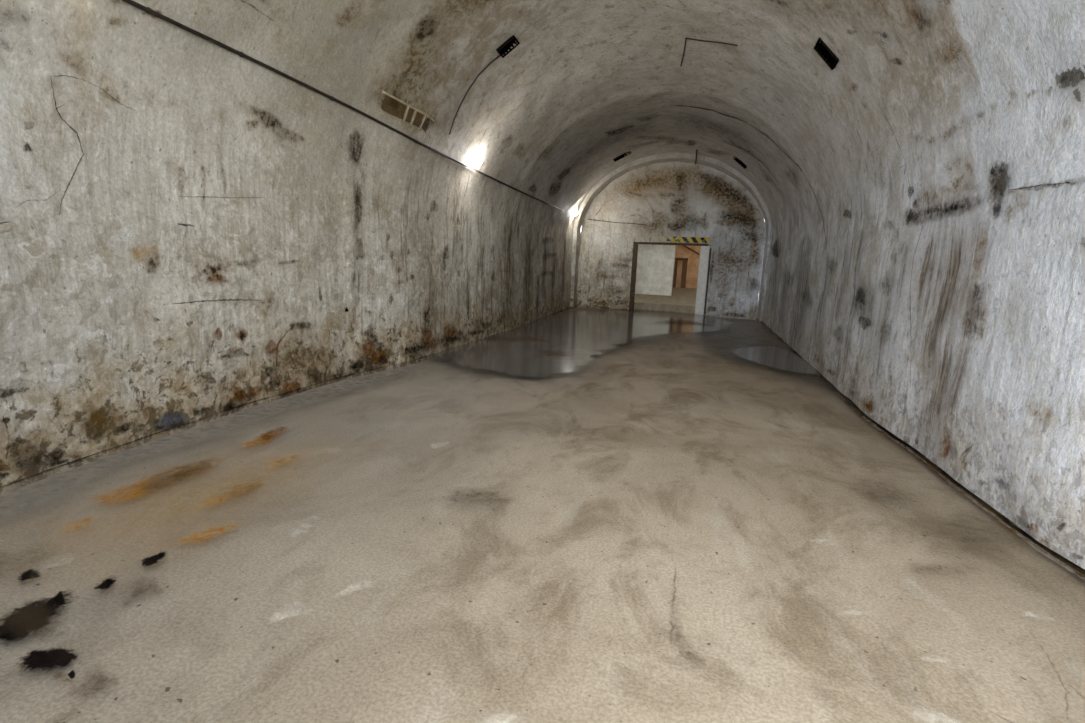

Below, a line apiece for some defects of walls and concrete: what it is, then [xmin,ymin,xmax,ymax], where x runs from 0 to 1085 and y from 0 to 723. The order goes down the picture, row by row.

leakage [393,20,434,88]
peeling [1055,67,1085,101]
leakage [266,323,327,396]
leakage [772,236,907,369]
leakage [919,232,984,418]
leakage [139,407,208,432]